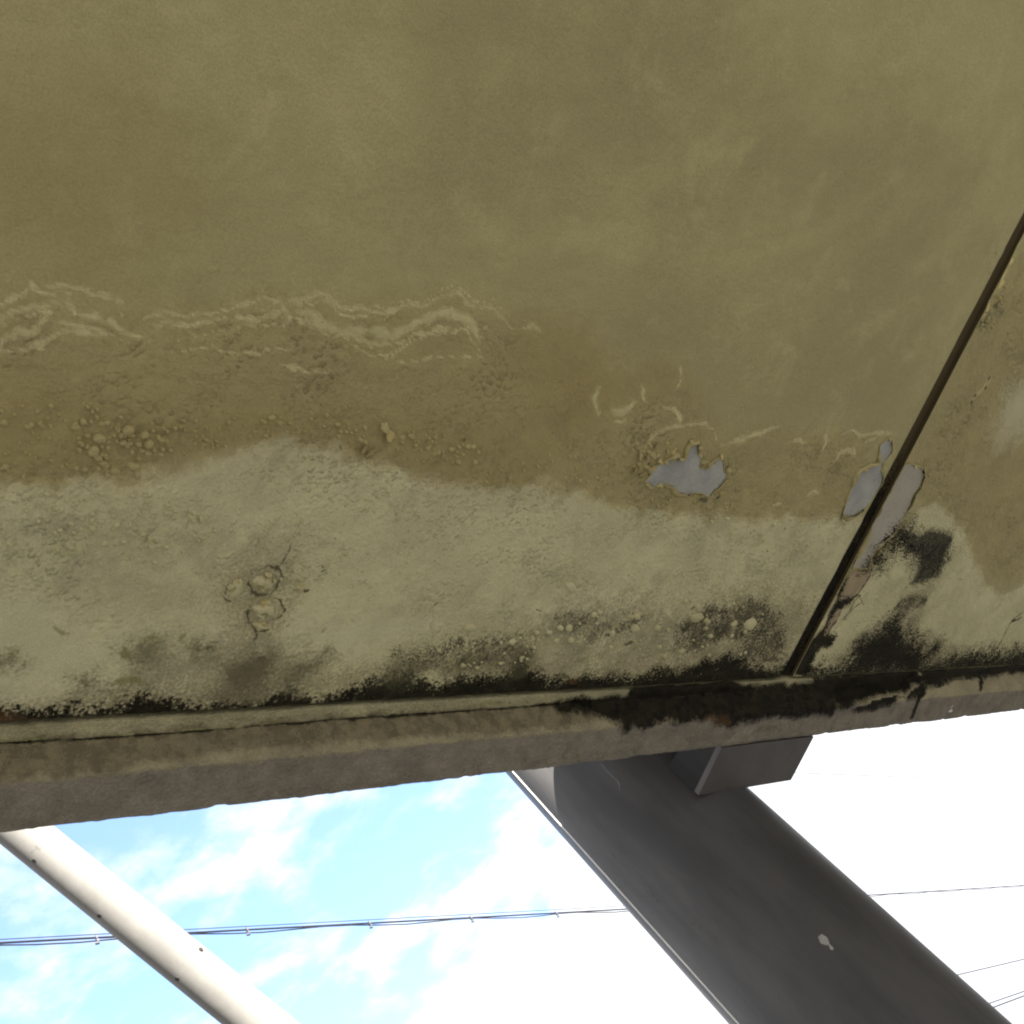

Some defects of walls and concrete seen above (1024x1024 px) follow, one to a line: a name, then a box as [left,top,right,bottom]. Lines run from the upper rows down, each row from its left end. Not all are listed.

damp [0,259,1024,744]
peeling [634,440,734,502]
peeling [824,438,926,634]